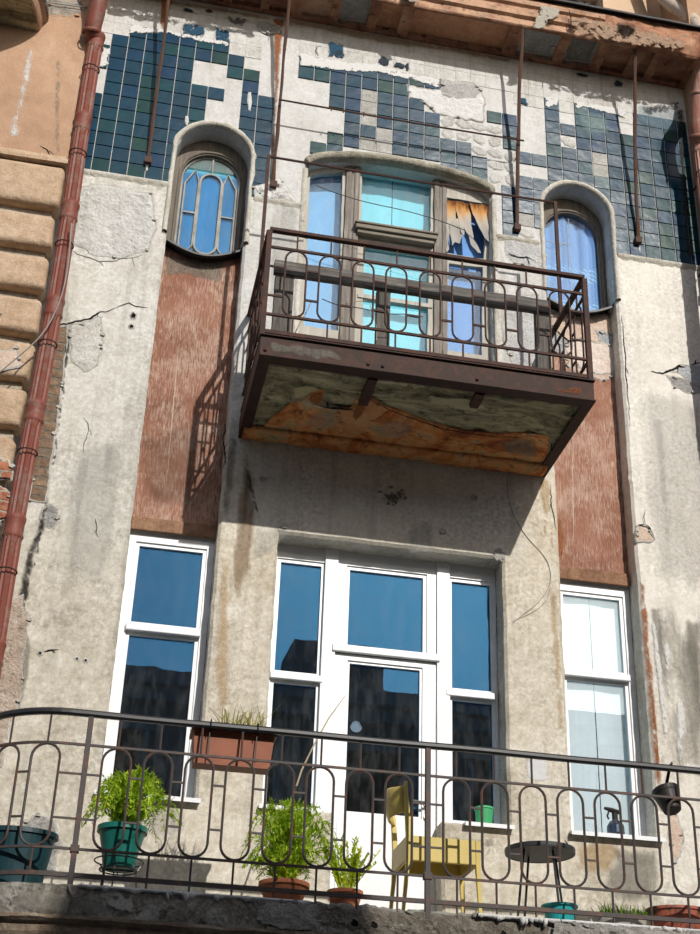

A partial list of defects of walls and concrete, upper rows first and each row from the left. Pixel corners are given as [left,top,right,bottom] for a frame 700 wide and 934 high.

peeling [100,47,111,67]
peeling [129,16,282,46]
peeling [299,42,486,123]
flaking render [29,316,106,504]
crack [60,302,147,338]
peeling [551,310,615,381]
crack [621,317,630,419]
crack [651,360,699,374]
spalling [0,594,32,768]
rust [641,584,660,780]
damp [653,610,670,732]
damp [677,623,700,767]